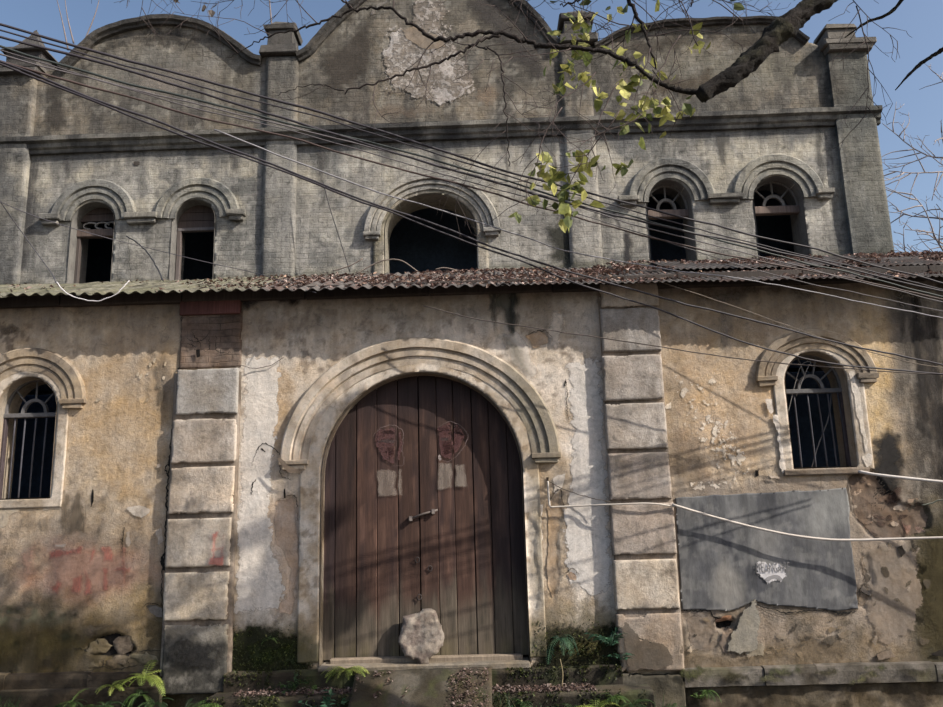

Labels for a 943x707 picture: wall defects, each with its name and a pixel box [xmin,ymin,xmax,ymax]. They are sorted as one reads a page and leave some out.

flaking render [382,0,475,106]
crack [160,429,172,616]
peeling [234,355,299,615]
water stain [491,293,527,370]
peeling [504,313,563,381]
peeling [540,357,612,599]
peeling [675,372,786,490]
flaking render [848,371,943,660]
water stain [898,288,943,480]